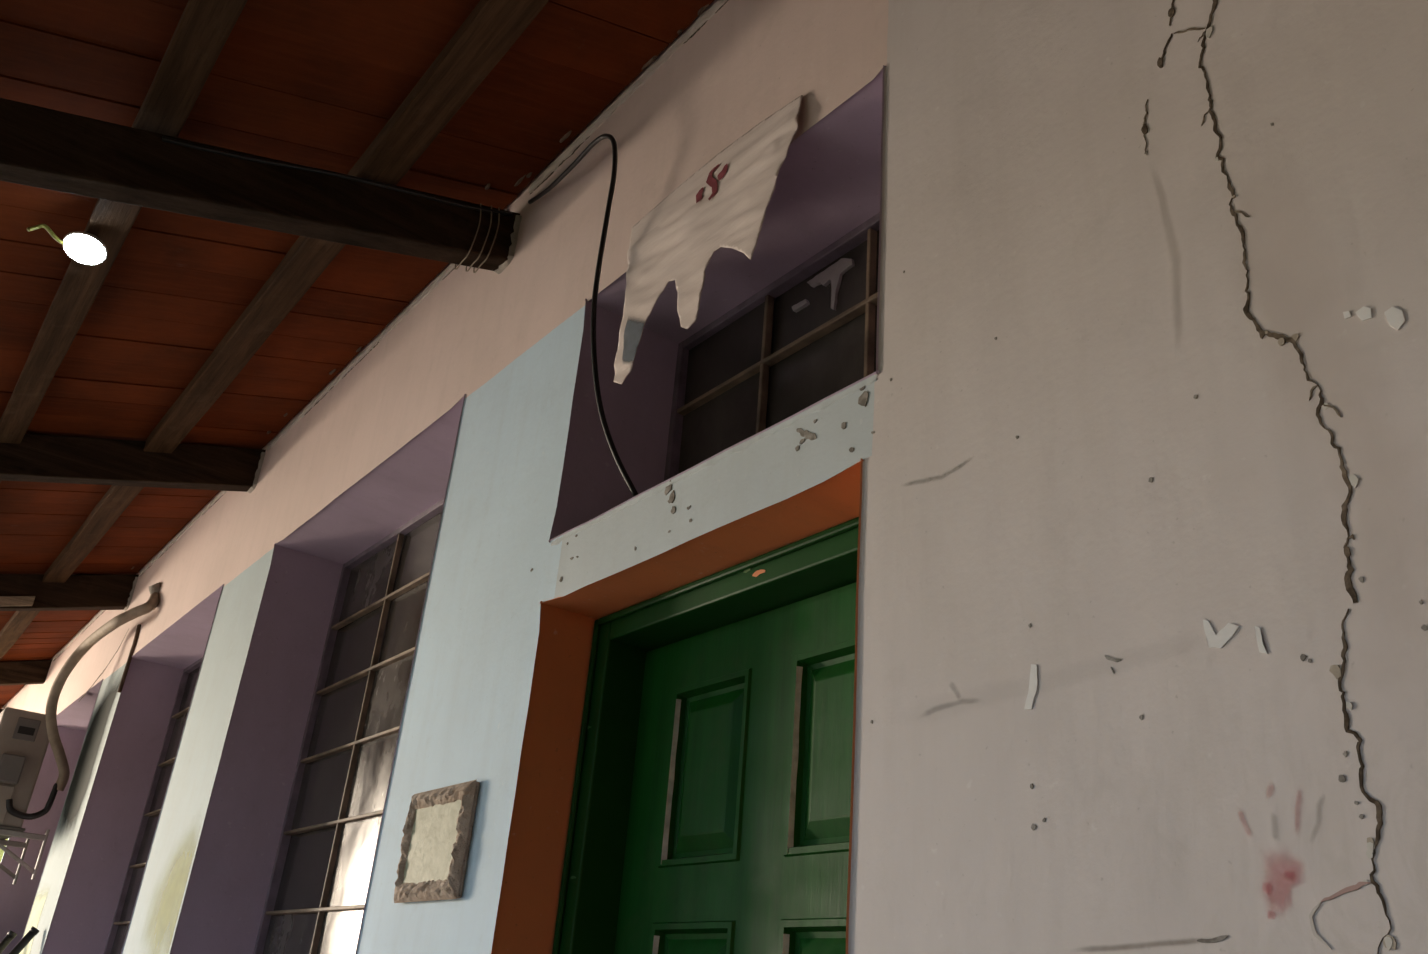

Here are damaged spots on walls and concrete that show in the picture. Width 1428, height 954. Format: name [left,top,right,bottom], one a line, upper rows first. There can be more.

crack [1141,0,1397,954]
peeling [1343,306,1406,330]